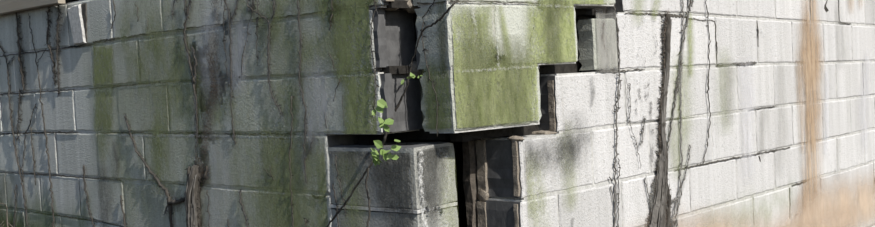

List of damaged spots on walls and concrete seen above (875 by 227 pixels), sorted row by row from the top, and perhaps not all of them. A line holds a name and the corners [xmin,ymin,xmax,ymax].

water stain [546,3,561,64]
crack [625,12,757,66]
crack [0,0,645,227]
rust [802,0,819,210]
crack [675,147,790,171]